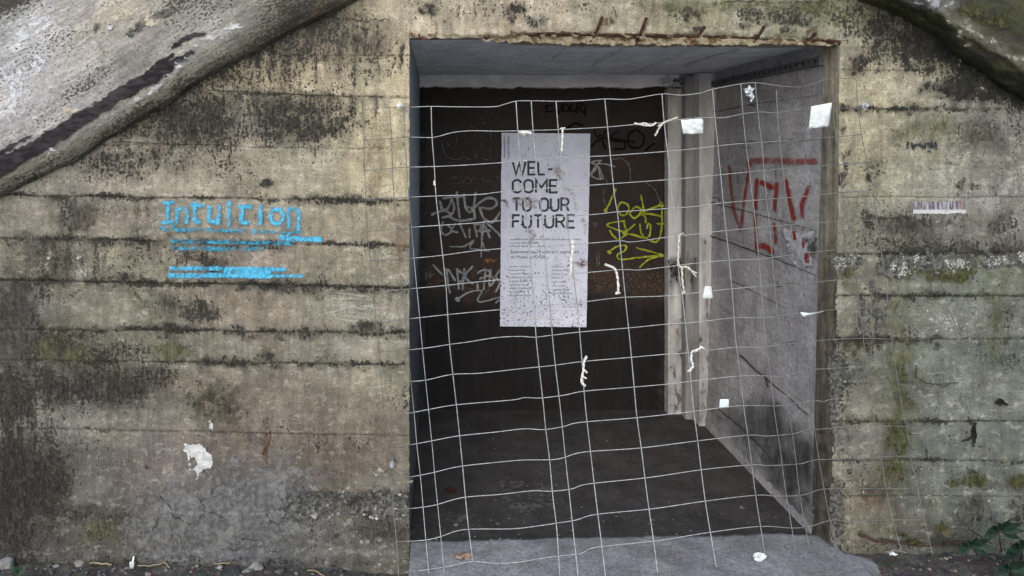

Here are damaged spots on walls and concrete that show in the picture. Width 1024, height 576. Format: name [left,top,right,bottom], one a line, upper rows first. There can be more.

damp [77,6,405,180]
damp [0,193,409,567]
crack [152,484,226,535]
crack [229,513,283,552]